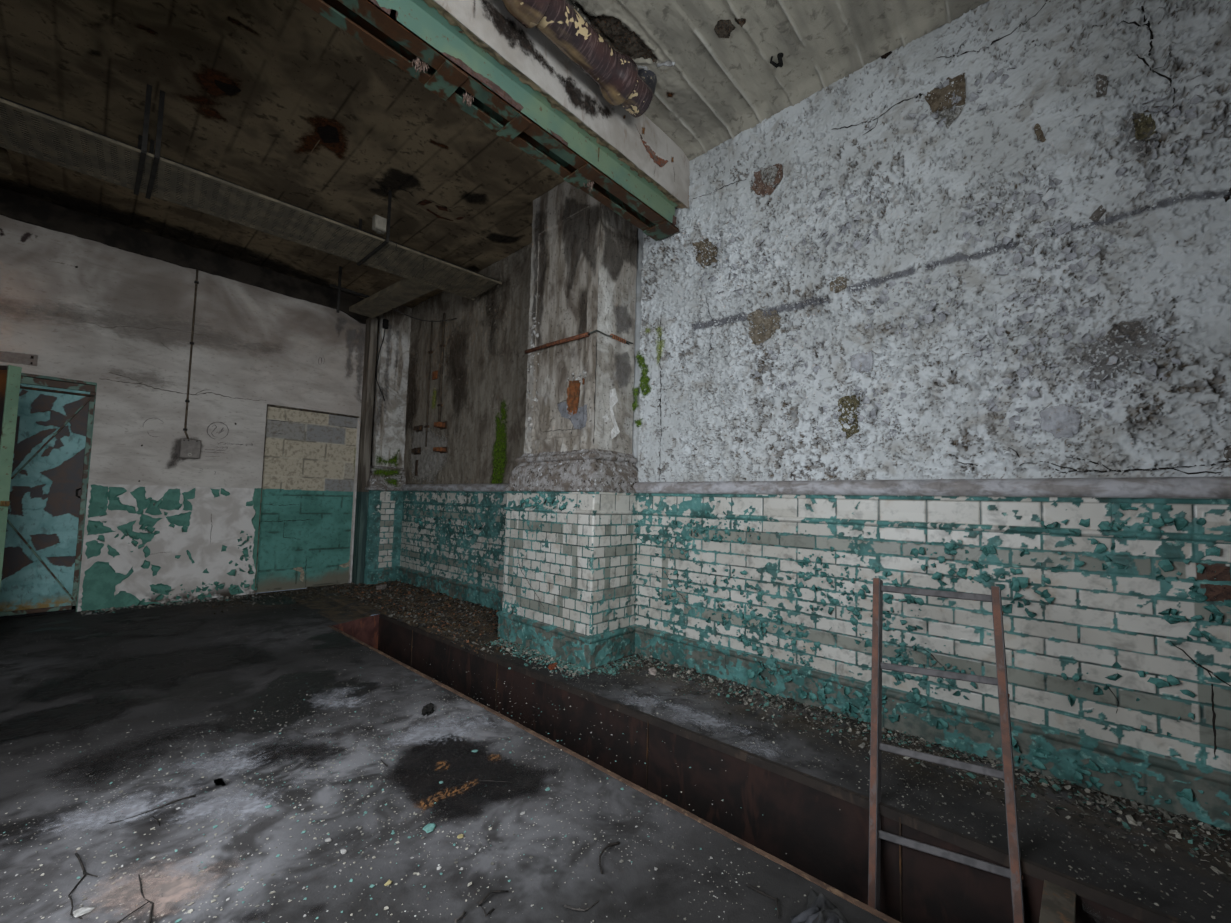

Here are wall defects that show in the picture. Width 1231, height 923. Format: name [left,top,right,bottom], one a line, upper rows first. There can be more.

spalling [583,11,657,63]
flaking render [907,62,1017,131]
crack [1119,6,1175,103]
flaking render [750,163,783,196]
flaking render [692,213,770,302]
flaking render [747,309,828,390]
peeling [80,484,263,611]
peeling [655,510,977,730]
peeling [909,503,1206,618]
peeling [1156,547,1231,642]
spalling [328,614,1196,923]